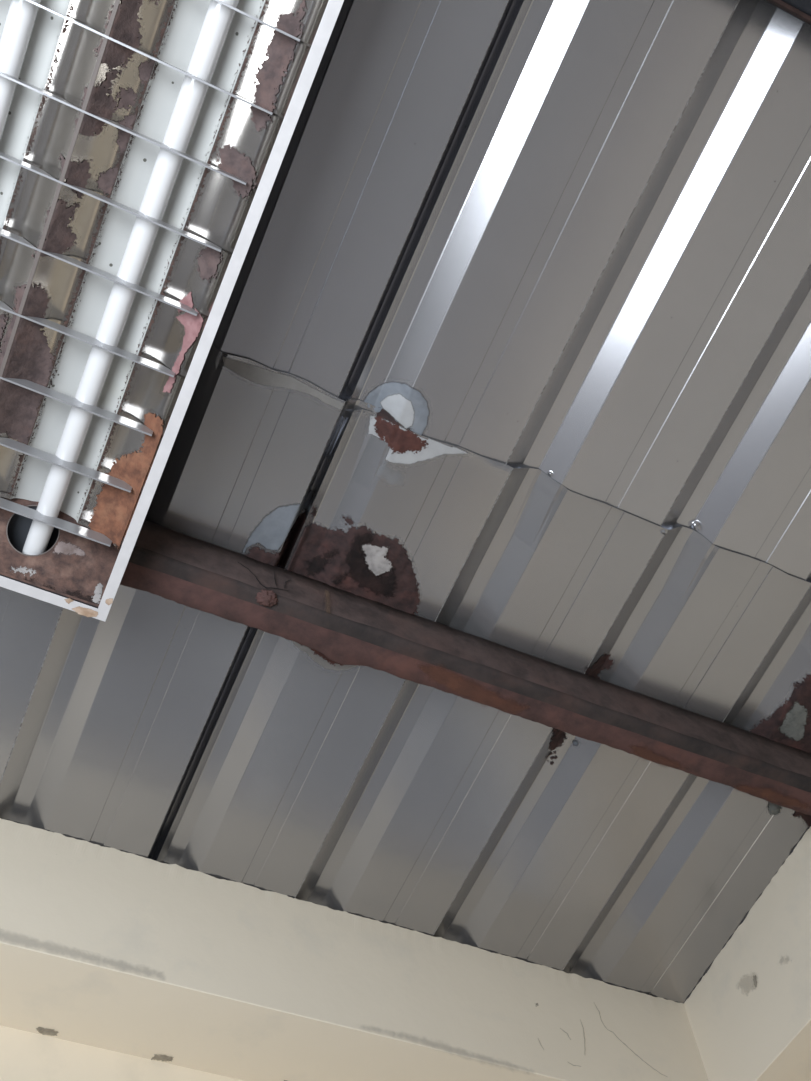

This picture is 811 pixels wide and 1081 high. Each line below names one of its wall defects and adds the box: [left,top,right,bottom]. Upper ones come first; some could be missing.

corrosion [0,0,178,496]
corrosion [77,0,306,548]
corrosion [374,407,429,454]
corrosion [246,504,420,615]
corrosion [421,666,525,714]
corrosion [585,654,613,679]
corrosion [749,675,811,753]
corrosion [546,728,578,765]
corrosion [631,746,680,768]
corrosion [737,786,811,827]